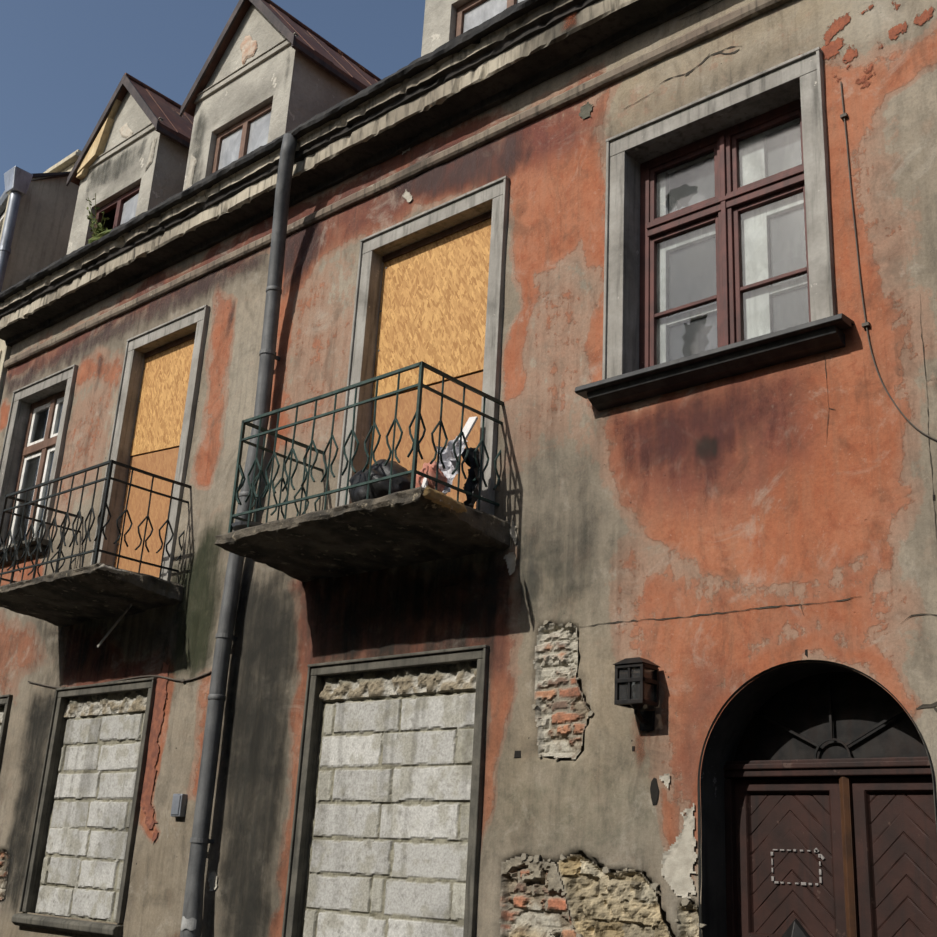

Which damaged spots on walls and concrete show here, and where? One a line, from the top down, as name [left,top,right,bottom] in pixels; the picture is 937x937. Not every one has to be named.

peeling [821,4,874,69]
peeling [876,6,935,49]
crack [624,46,739,109]
damp [284,230,318,287]
damp [312,554,508,660]
crack [575,596,862,628]
flaking render [531,620,594,761]
crack [916,701,937,712]
peeling [140,662,170,841]
damp [222,573,295,937]
spalling [650,774,670,806]
flaking render [499,803,707,937]